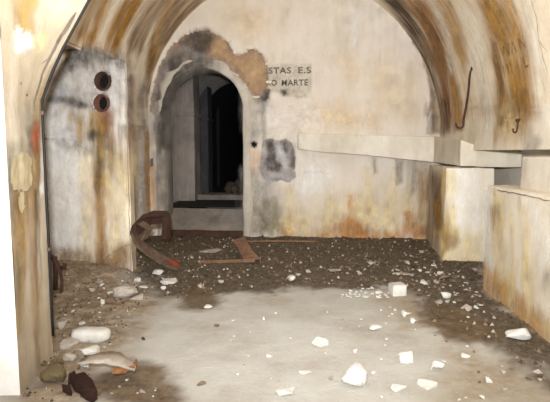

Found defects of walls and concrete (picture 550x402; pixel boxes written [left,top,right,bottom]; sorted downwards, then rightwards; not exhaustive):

leakage [49,89,85,110]
flaking render [150,27,272,115]
leakage [387,0,465,134]
leakage [479,0,529,135]
flaking render [11,152,32,213]
leakage [59,113,126,267]